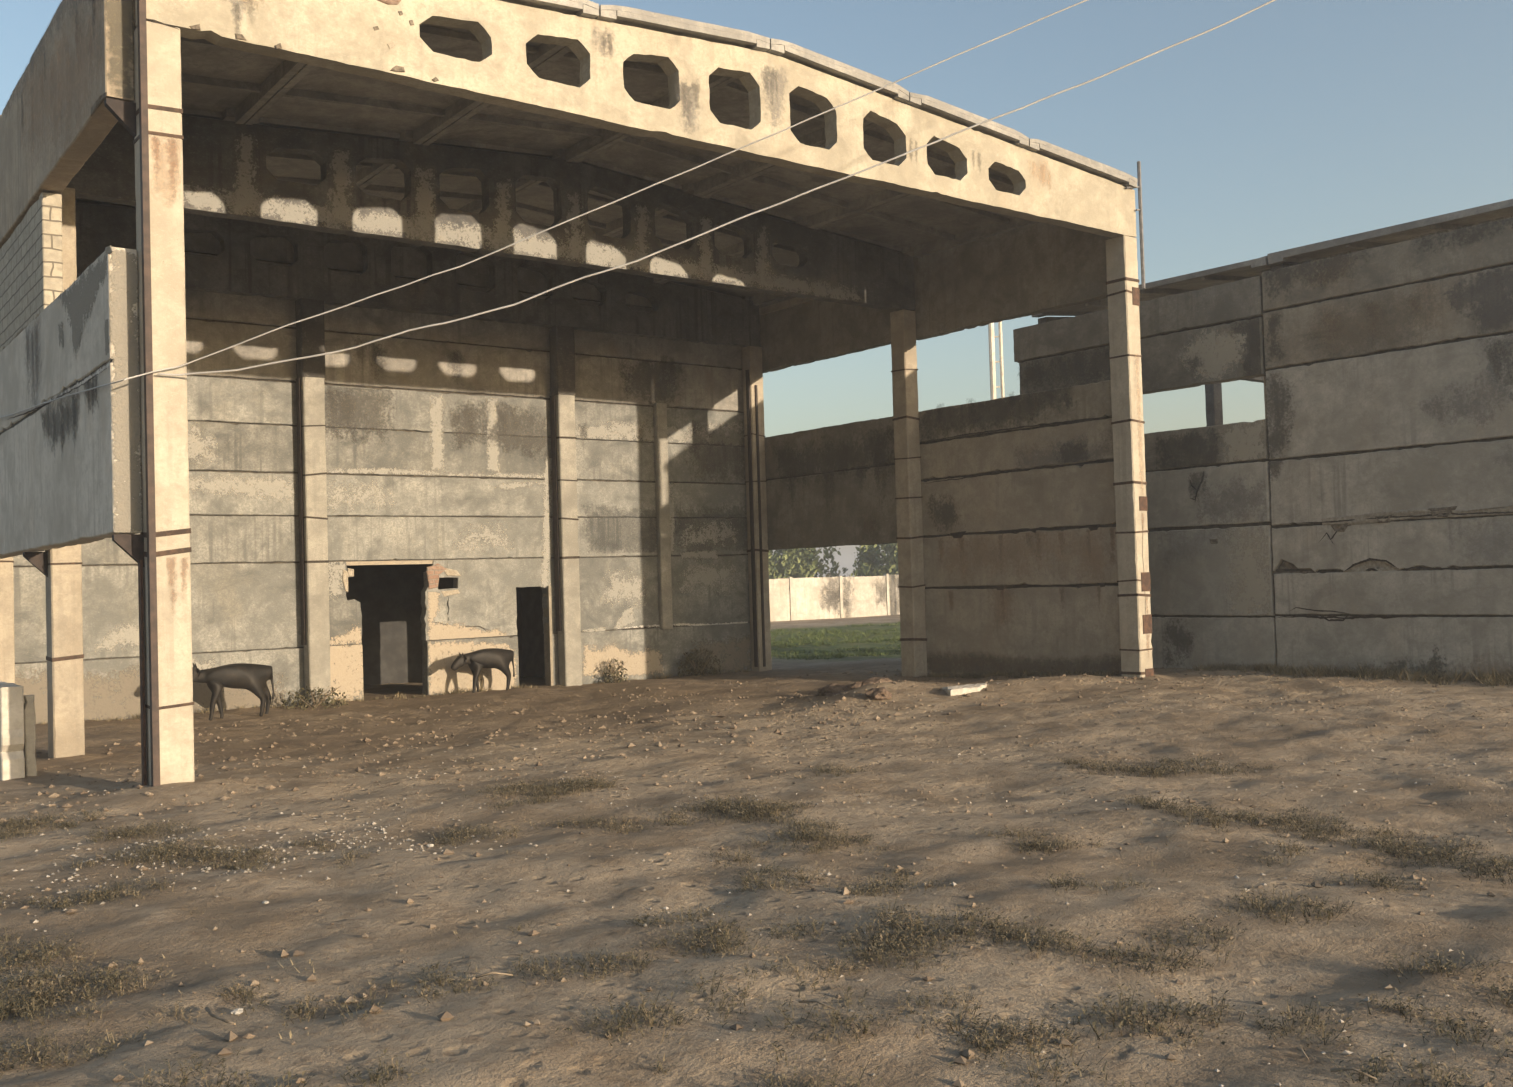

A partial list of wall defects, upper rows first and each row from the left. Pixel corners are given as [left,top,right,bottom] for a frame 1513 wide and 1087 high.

water stain [44,377,99,450]
spalling [1290,505,1513,532]